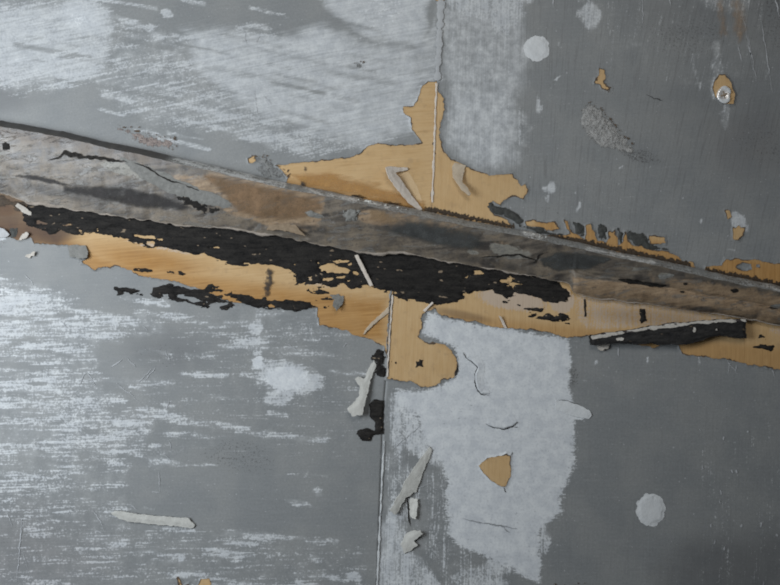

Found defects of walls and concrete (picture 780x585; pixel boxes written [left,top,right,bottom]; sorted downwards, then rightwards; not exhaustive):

peeling [709,72,737,107]
peeling [118,155,233,209]
peeling [274,79,780,283]
peeling [0,193,780,390]
crack [455,351,490,395]
crack [486,416,518,430]
peeling [555,400,592,419]
peeling [476,451,514,491]
peeling [409,498,418,519]
peeling [400,530,423,554]
peeling [174,574,214,585]